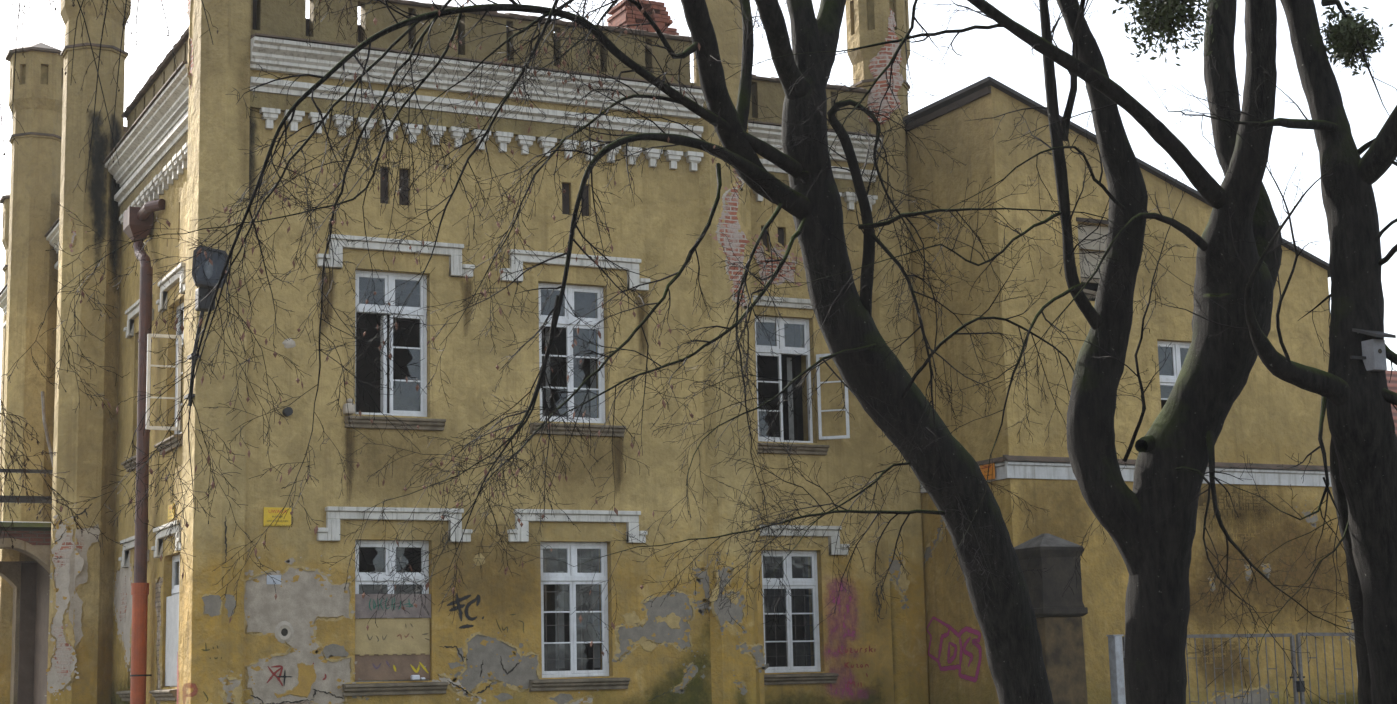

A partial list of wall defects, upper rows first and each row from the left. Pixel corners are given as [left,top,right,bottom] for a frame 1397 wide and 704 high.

flaking render [868,9,904,125]
water stain [89,114,121,279]
flaking render [709,169,803,320]
flaking render [45,515,102,700]
flaking render [201,555,357,704]
flaking render [425,629,541,704]
flaking render [549,692,594,704]
flaking render [606,551,769,695]